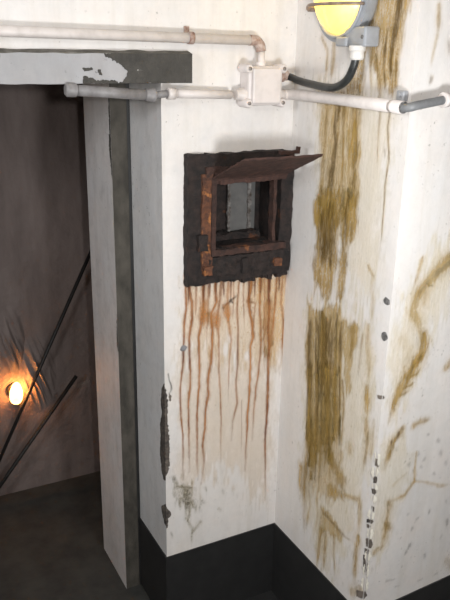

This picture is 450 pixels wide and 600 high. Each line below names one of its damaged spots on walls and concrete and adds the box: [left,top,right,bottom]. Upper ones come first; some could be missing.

peeling [82,53,192,84]
damp [347,0,407,94]
damp [299,105,361,497]
damp [410,258,450,326]
rust [180,281,239,451]
rust [246,275,287,469]
damp [391,332,428,410]
spalling [160,383,172,481]
spalling [161,504,171,528]